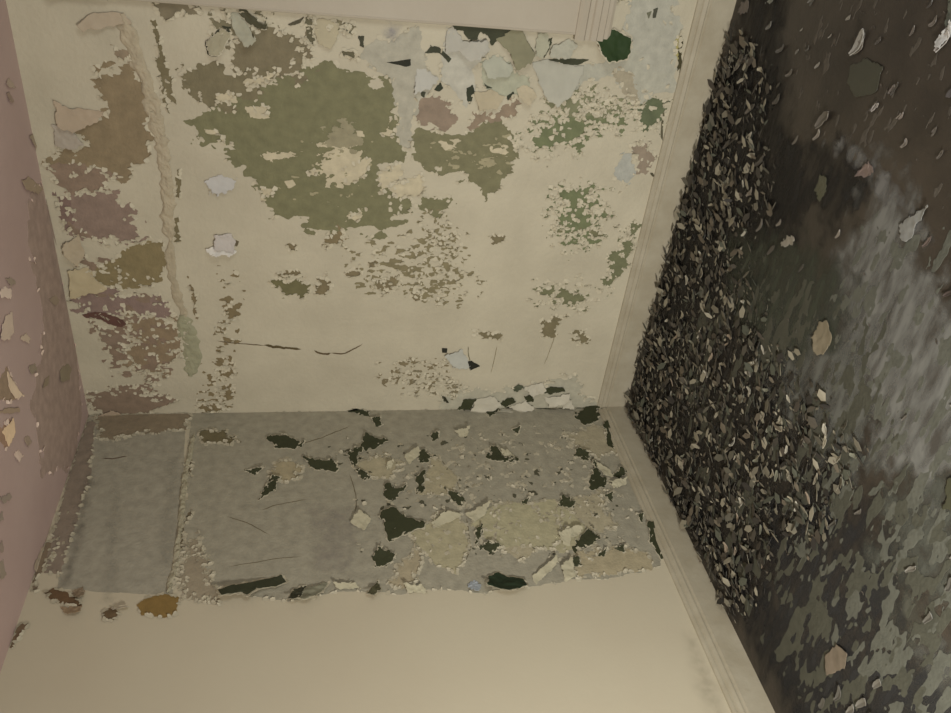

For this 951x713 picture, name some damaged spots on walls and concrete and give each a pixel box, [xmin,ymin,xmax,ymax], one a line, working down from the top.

peeling [854,161,873,178]
peeling [814,175,827,202]
peeling [780,235,795,247]
peeling [899,205,928,242]
peeling [0,0,685,623]
peeling [811,320,832,355]
leakage [633,0,951,713]
peeling [10,621,30,650]